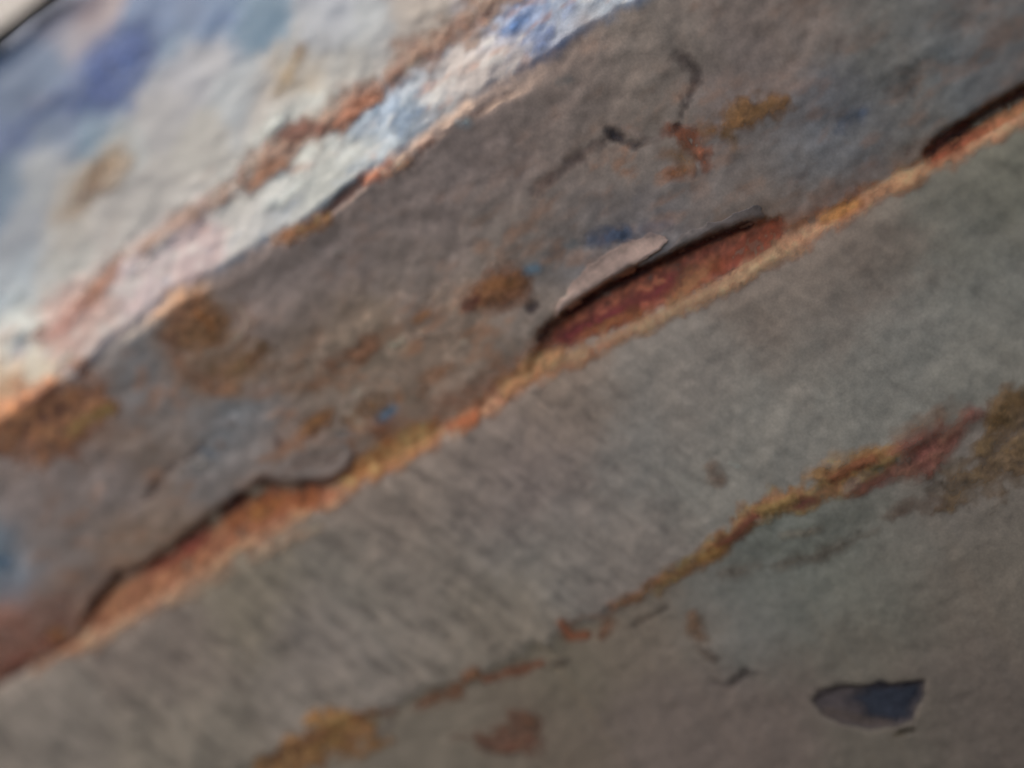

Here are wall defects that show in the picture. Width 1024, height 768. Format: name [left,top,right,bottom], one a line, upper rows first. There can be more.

rust [667,96,789,176]
peeling [538,205,782,348]
rust [0,378,117,468]
rust [34,112,1024,673]
peeling [813,681,924,735]